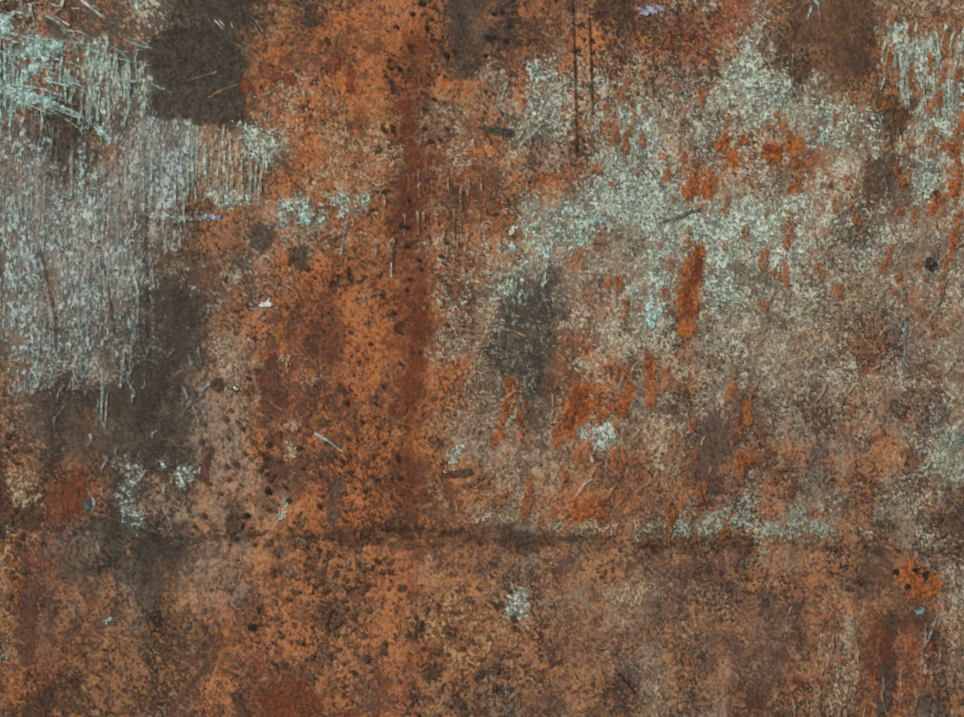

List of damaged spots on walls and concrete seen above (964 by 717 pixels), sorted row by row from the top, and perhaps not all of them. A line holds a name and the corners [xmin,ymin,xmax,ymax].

peeling [0,34,280,398]
peeling [512,53,565,135]
peeling [502,93,816,332]
corrosion [590,79,740,216]
corrosion [714,105,817,288]
peeling [719,28,884,167]
peeling [886,0,964,101]
peeling [908,75,964,205]
corrosion [925,42,964,215]
corrosion [604,273,630,318]
corrosion [658,229,712,349]
corrosion [553,349,674,452]